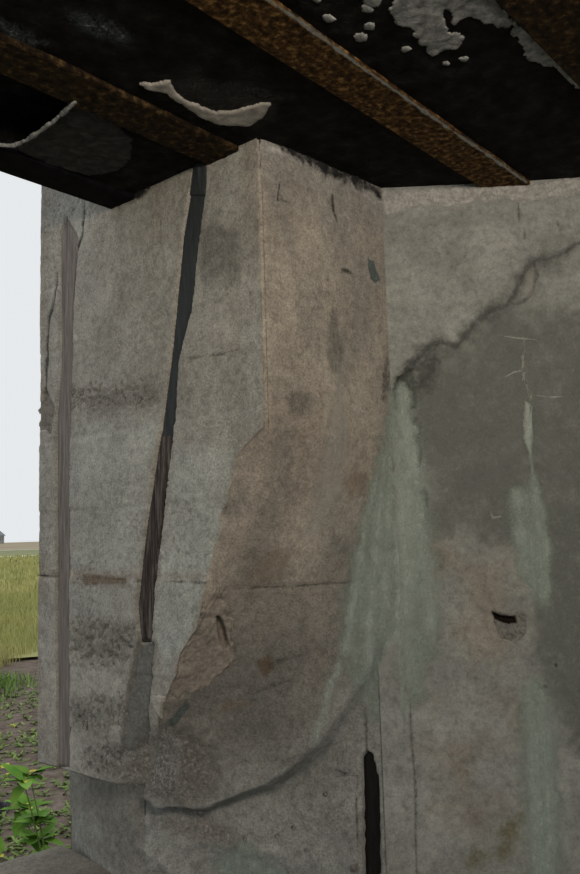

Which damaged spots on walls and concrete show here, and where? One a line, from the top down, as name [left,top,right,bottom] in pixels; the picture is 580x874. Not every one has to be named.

peeling [353,0,580,89]
peeling [139,76,272,127]
crack [45,280,76,393]
crack [405,260,538,379]
crack [504,336,563,417]
leakage [326,314,580,874]
spalling [152,589,236,719]